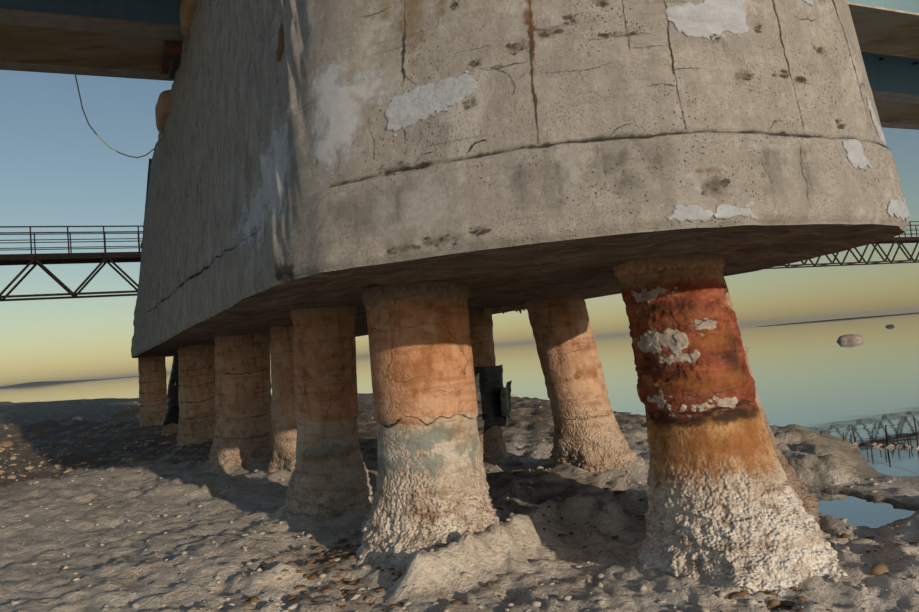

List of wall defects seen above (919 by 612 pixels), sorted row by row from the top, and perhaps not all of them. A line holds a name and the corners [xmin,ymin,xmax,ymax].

flaking render [665,0,762,40]
flaking render [311,60,479,166]
crack [315,0,887,207]
flaking render [835,119,872,170]
spalling [702,178,731,195]
flaking render [667,202,759,223]
flaking render [887,195,910,221]